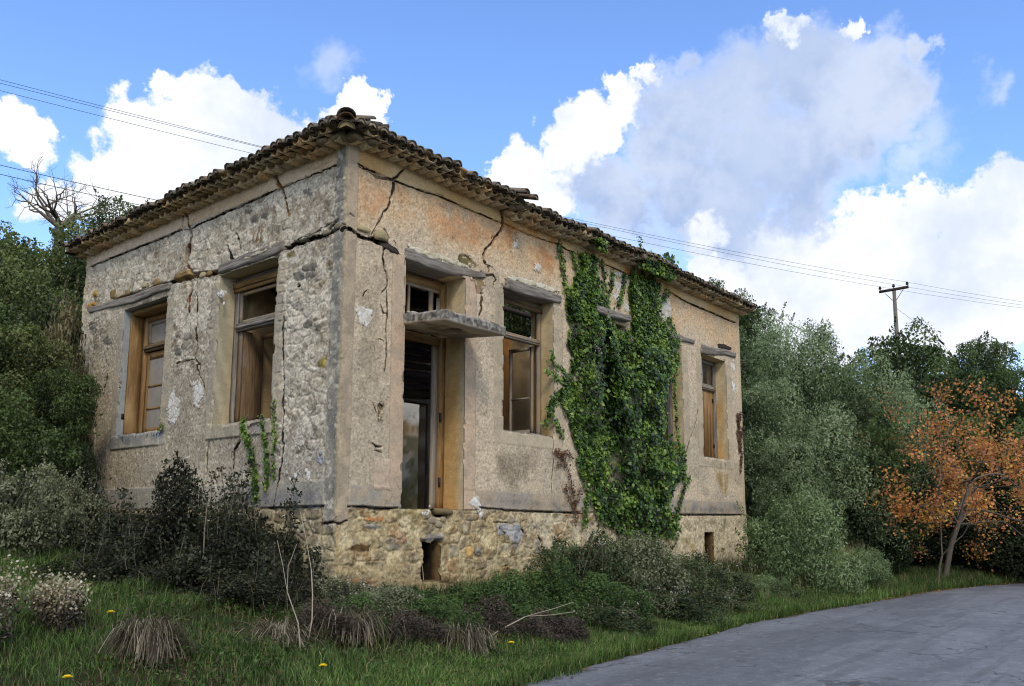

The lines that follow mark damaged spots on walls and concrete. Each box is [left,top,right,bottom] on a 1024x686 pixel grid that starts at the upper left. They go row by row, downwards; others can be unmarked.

crack [91,163,631,390]
peeling [166,380,205,425]